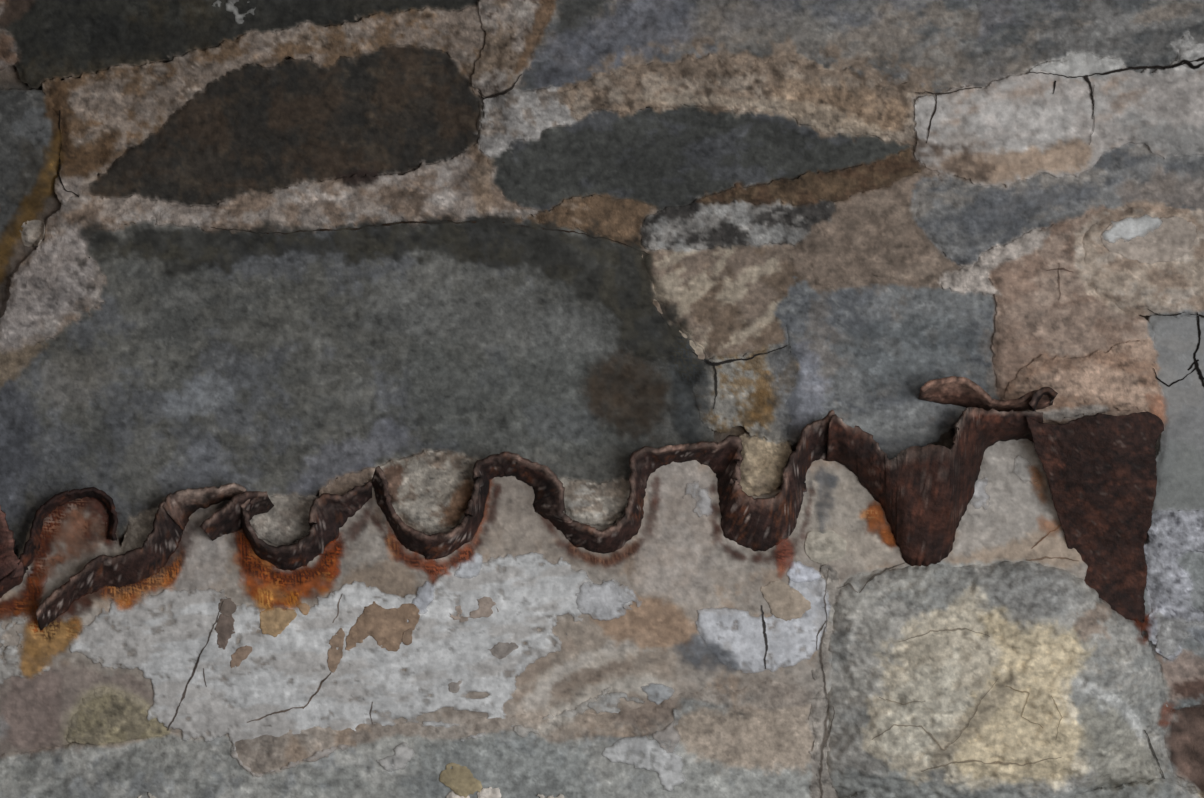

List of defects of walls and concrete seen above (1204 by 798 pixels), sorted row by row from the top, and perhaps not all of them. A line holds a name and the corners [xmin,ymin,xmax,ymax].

crack [922,87,982,143]
crack [1027,57,1204,145]
crack [1148,309,1204,387]
corrosion [0,497,186,677]
corrosion [234,479,501,609]
corrosion [560,544,640,566]
corrosion [725,539,793,572]
corrosion [862,502,896,545]